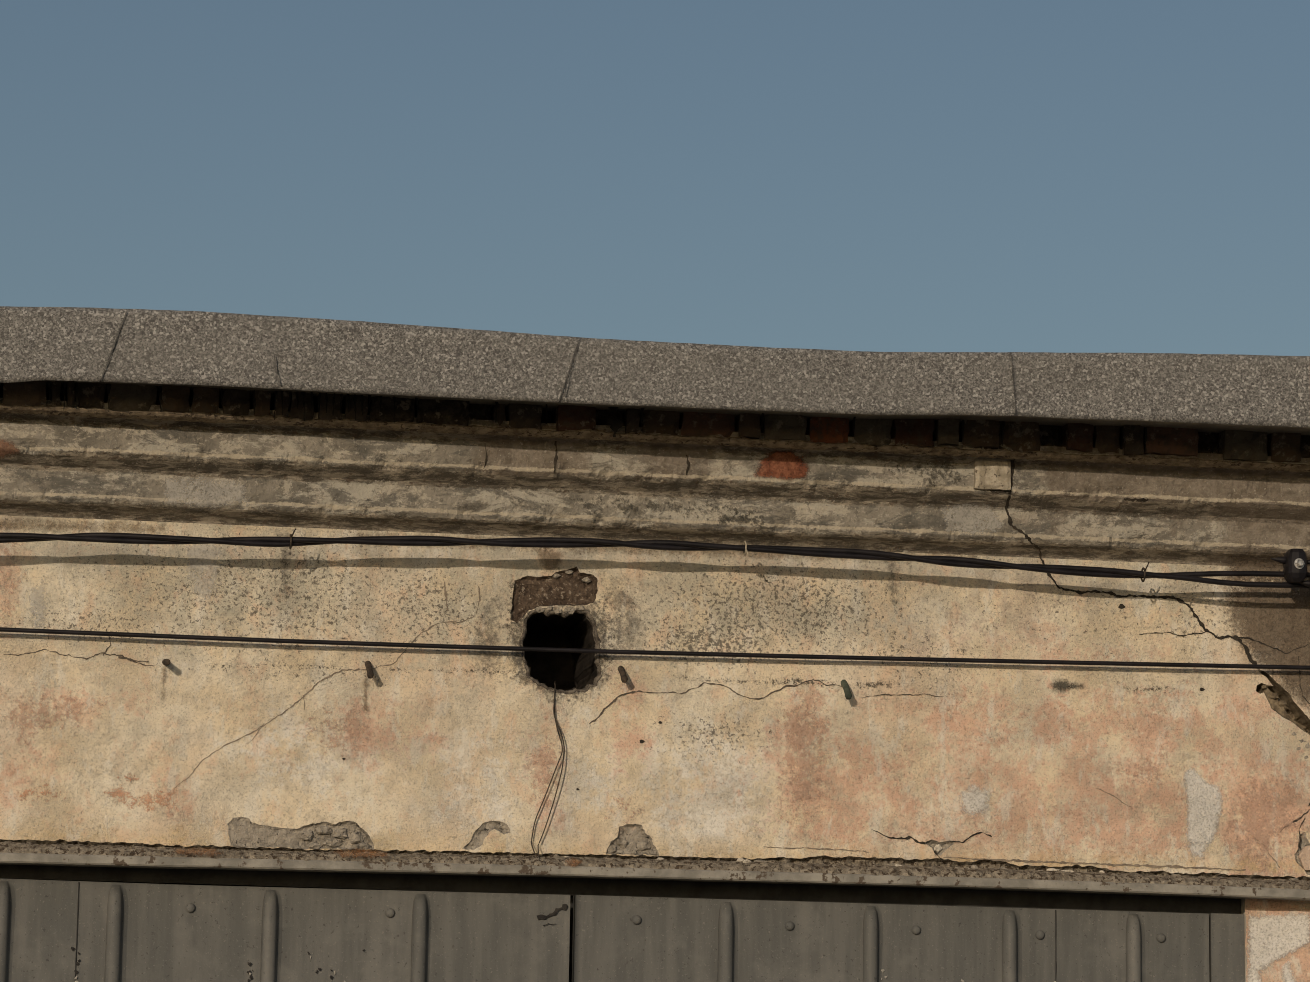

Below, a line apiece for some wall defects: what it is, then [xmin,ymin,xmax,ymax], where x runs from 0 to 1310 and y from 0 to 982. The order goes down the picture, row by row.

flaking render [755,451,808,480]
crack [974,421,1310,704]
crack [175,582,481,788]
spalling [510,566,602,694]
crack [589,679,942,724]
flaking render [0,768,1310,881]
crack [764,803,1310,871]